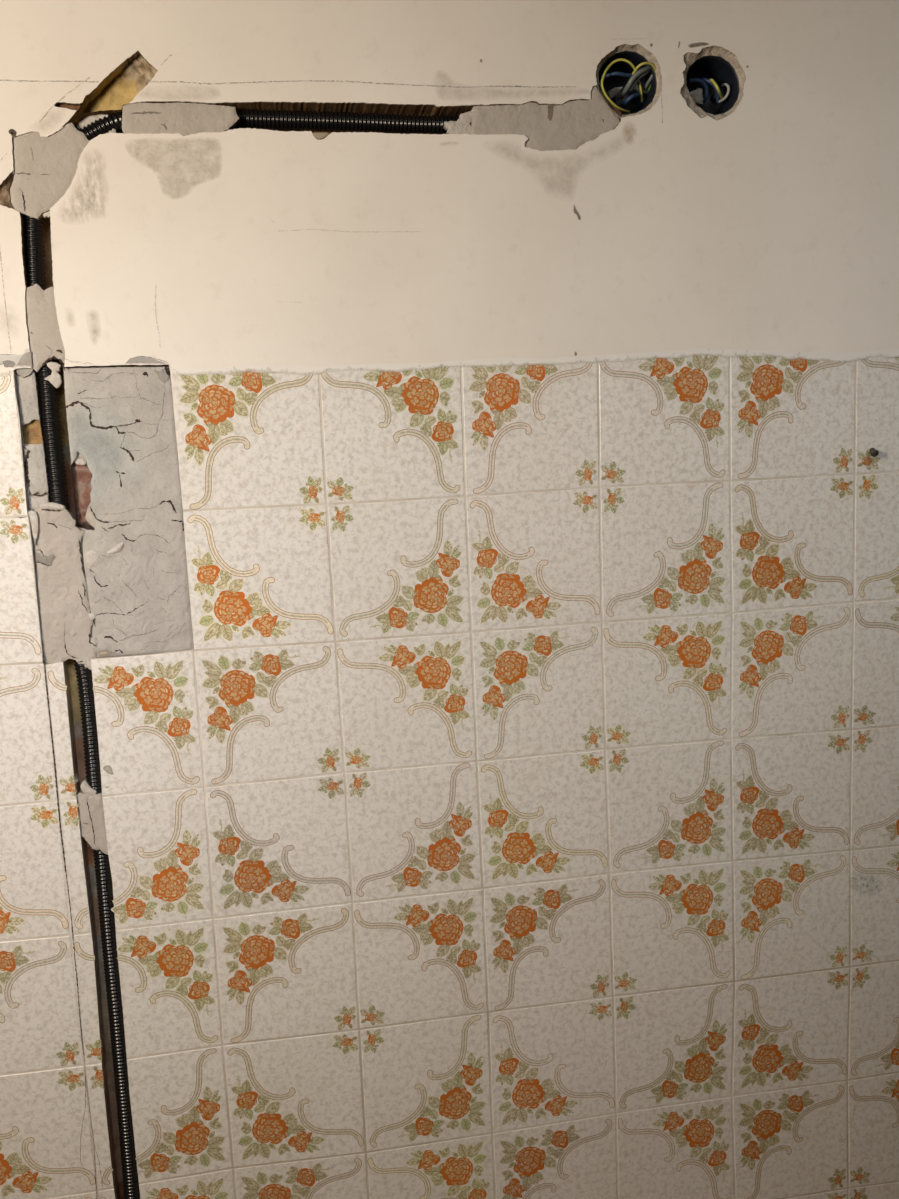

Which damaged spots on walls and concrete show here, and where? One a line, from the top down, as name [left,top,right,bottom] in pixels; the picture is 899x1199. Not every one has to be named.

spalling [0,172,13,209]
peeling [126,356,168,377]
spalling [22,420,43,444]
spalling [71,462,95,530]
spalling [35,549,56,566]
crack [16,346,185,1199]